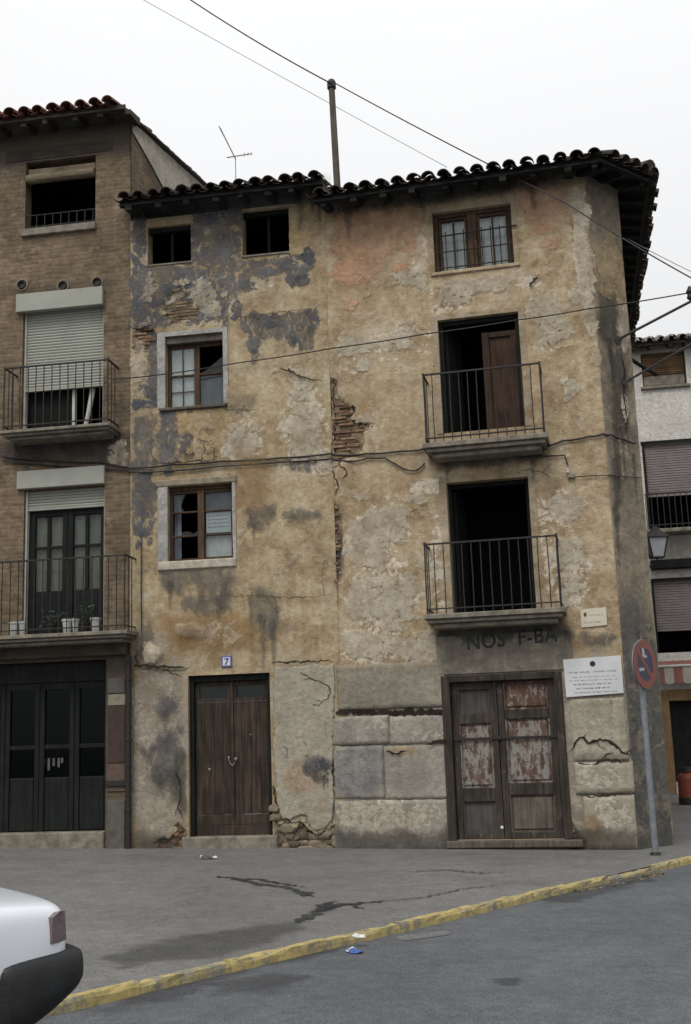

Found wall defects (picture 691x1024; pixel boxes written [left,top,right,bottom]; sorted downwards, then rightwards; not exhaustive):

peeling [108,201,510,549]
crack [281,368,373,497]
crack [133,653,188,677]
crack [272,660,447,755]
leakage [141,725,186,811]
crack [571,733,633,765]
crack [174,772,184,821]
spalling [159,822,187,848]
spalling [268,804,336,848]